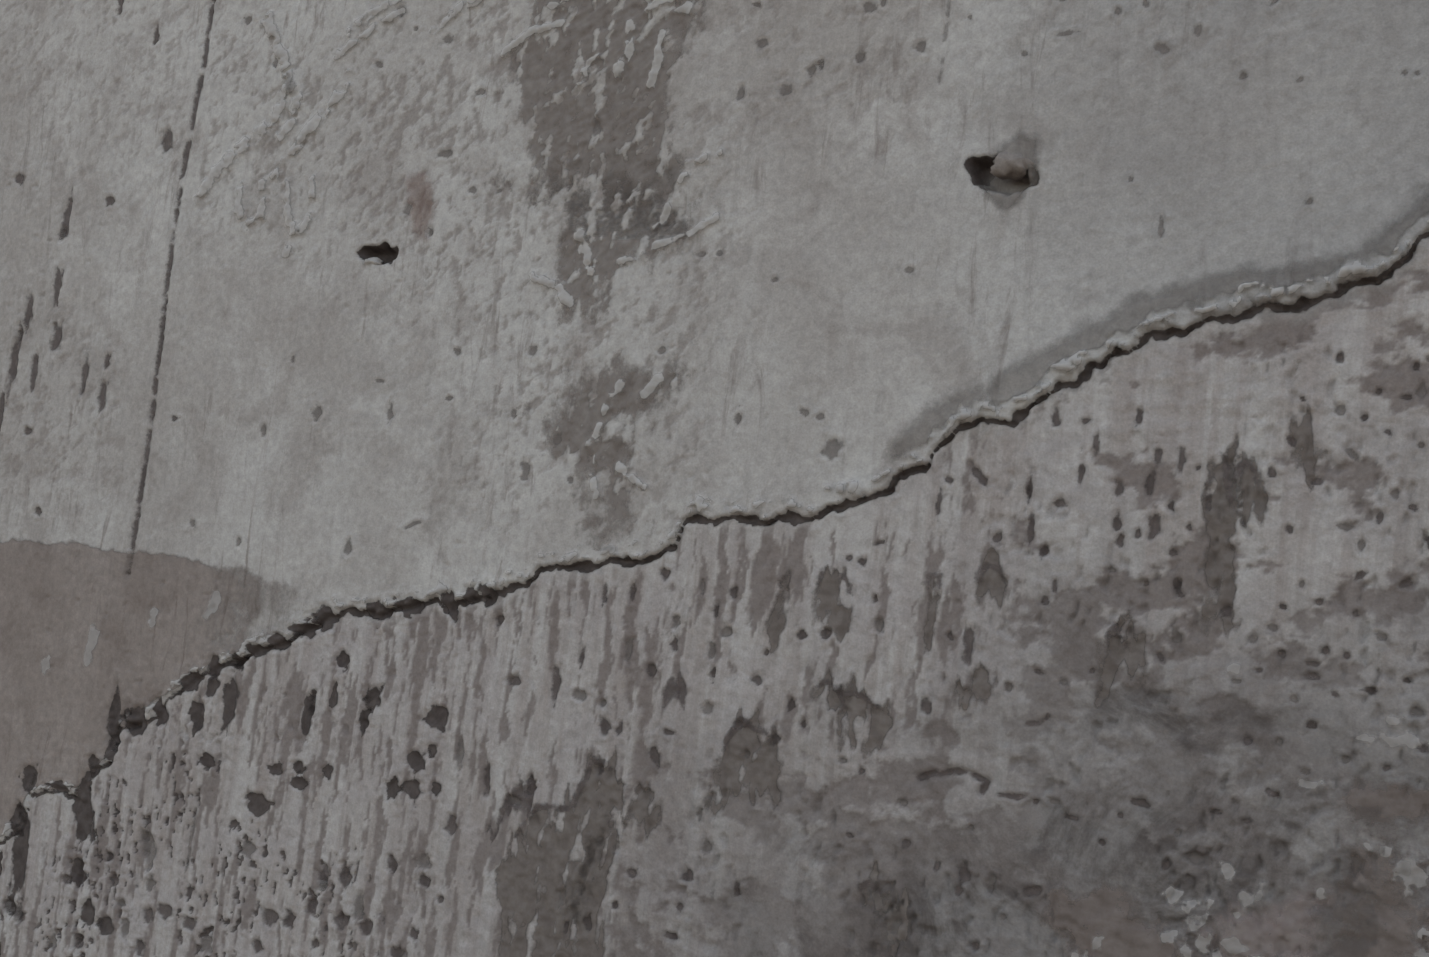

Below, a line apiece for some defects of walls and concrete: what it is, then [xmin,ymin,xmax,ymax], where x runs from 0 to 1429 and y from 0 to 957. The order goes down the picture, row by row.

spalling [0,268,64,430]
peeling [547,346,681,543]
spalling [1287,396,1326,490]
crack [0,219,1429,917]
spalling [764,555,867,655]
spalling [976,533,1007,608]
spalling [1113,501,1174,547]
spalling [1178,441,1277,643]
spalling [487,667,662,957]
spalling [698,708,783,821]
spalling [810,670,893,774]
spalling [63,831,195,956]